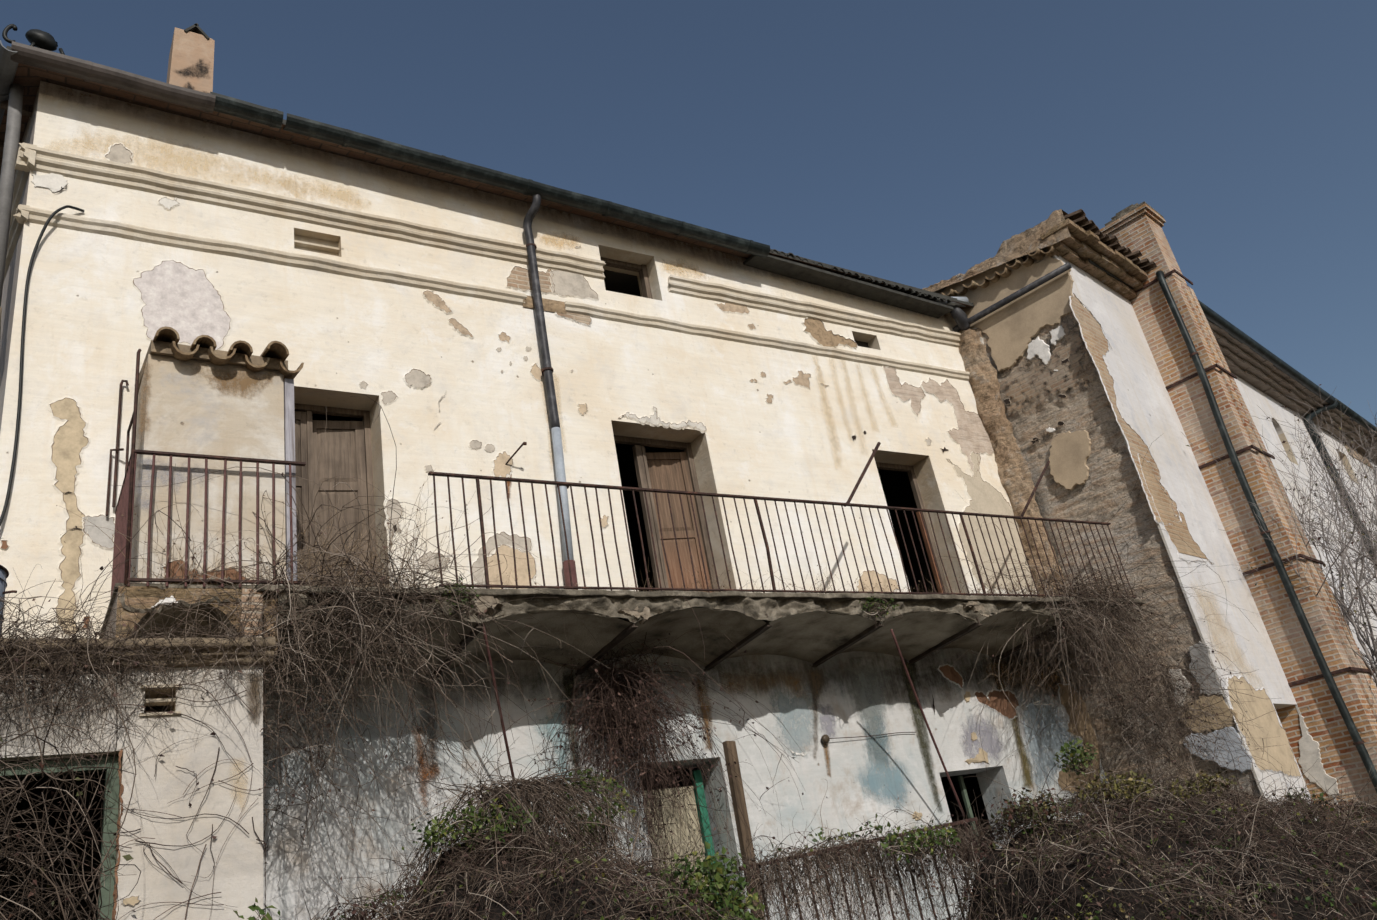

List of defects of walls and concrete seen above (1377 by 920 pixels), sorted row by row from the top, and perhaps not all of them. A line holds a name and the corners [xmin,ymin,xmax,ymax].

flaking render [131,259,233,350]
flaking render [504,265,600,327]
spalling [801,318,858,350]
flaking render [359,368,433,406]
flaking render [943,256,1214,565]
flaking render [48,395,115,637]
flaking render [882,366,1034,620]
flaking render [469,530,538,617]
corrosion [409,728,439,804]
leakage [418,653,1068,759]
flaking render [938,664,1020,720]
flaking render [1169,669,1339,796]